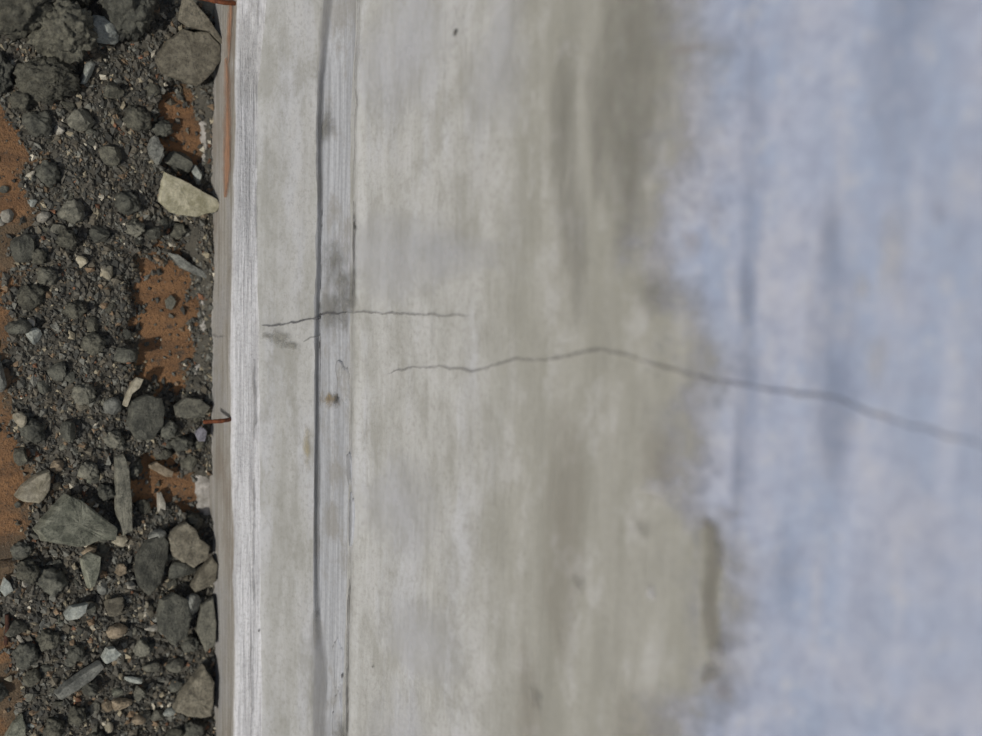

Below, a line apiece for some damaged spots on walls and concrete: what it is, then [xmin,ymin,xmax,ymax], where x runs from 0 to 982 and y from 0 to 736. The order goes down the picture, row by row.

crack [262,201,354,327]